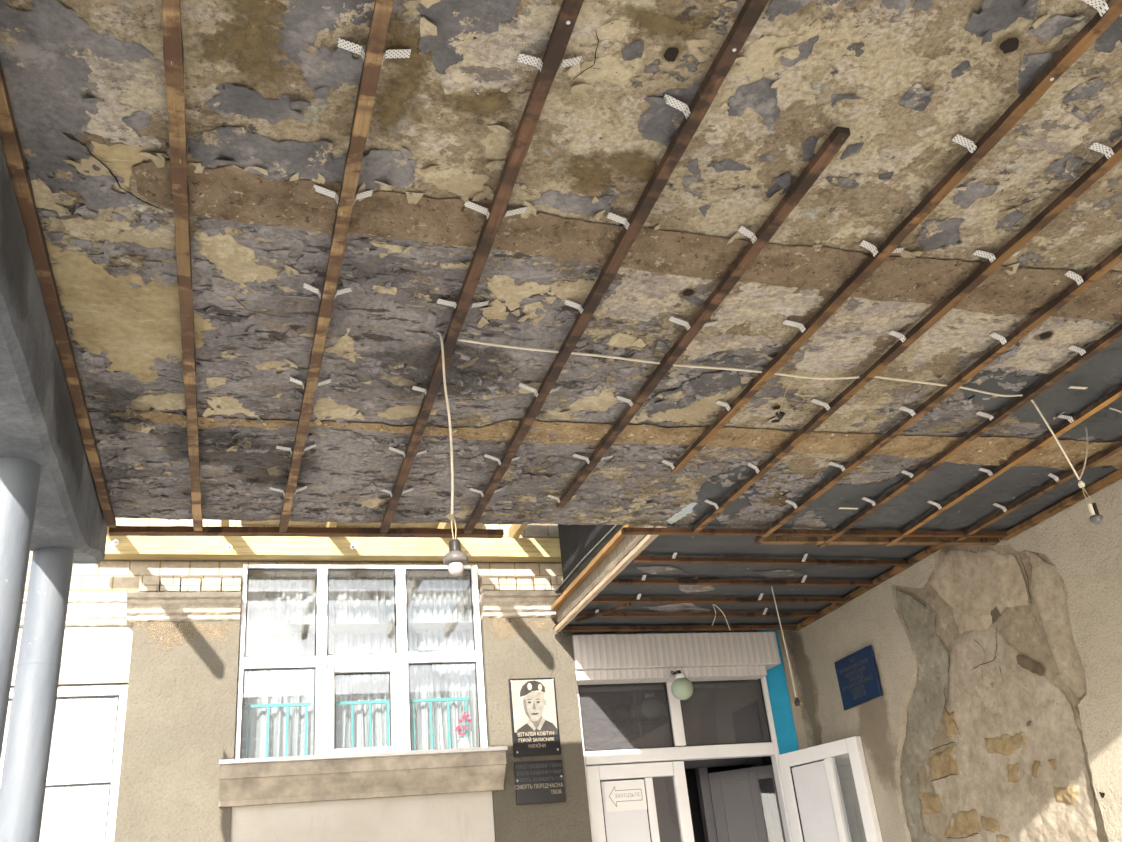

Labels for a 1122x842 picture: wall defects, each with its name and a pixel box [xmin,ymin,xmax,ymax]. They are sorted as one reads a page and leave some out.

peeling [0,0,375,518]
leakage [202,0,287,74]
spalling [339,125,513,310]
peeling [401,0,561,95]
peeling [568,3,645,93]
leakage [566,150,659,193]
peeling [638,77,705,147]
peeling [682,0,864,189]
peeling [964,0,1087,94]
peeling [1012,78,1104,180]
peeling [1094,14,1122,53]
flaking render [202,180,1122,842]